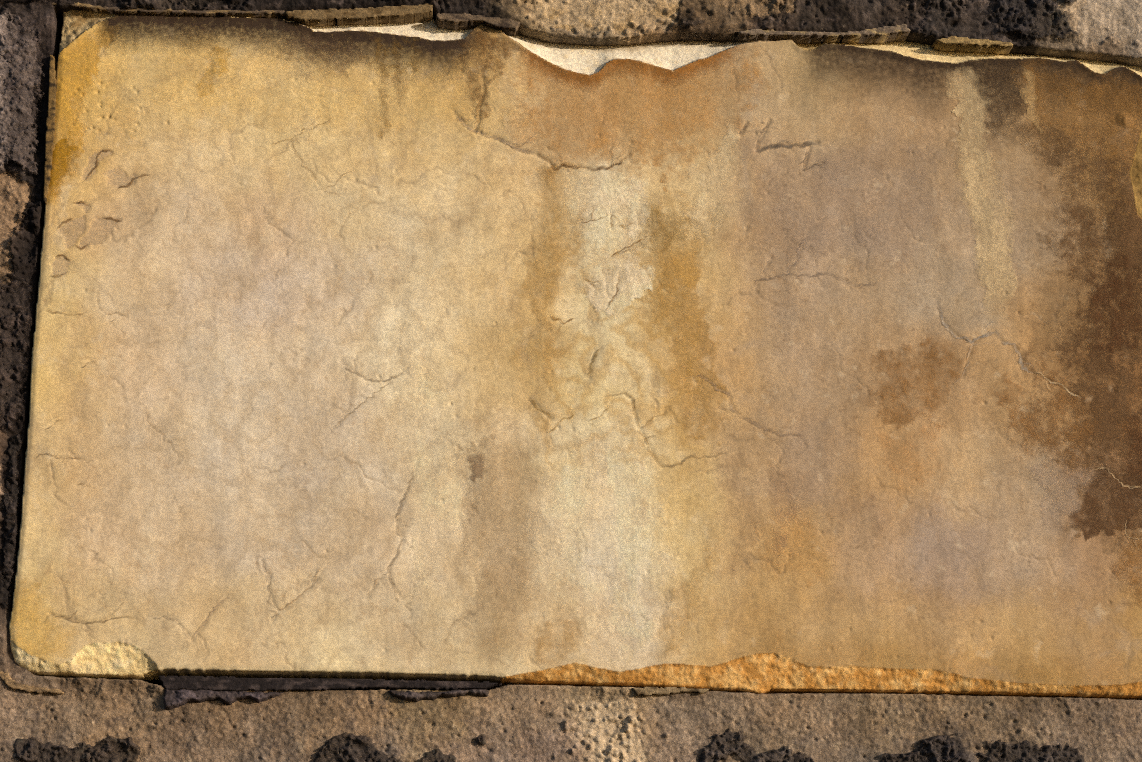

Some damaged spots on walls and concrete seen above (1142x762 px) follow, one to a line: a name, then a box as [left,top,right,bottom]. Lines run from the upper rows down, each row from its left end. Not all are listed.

spalling [299,17,476,41]
spalling [503,0,757,75]
spalling [715,0,796,18]
spalling [778,39,1142,77]
spalling [1076,0,1142,48]
crack [741,125,819,170]
leakage [952,71,1017,294]
spalling [1129,130,1142,218]
spalling [10,640,285,710]
spalling [388,653,1142,762]